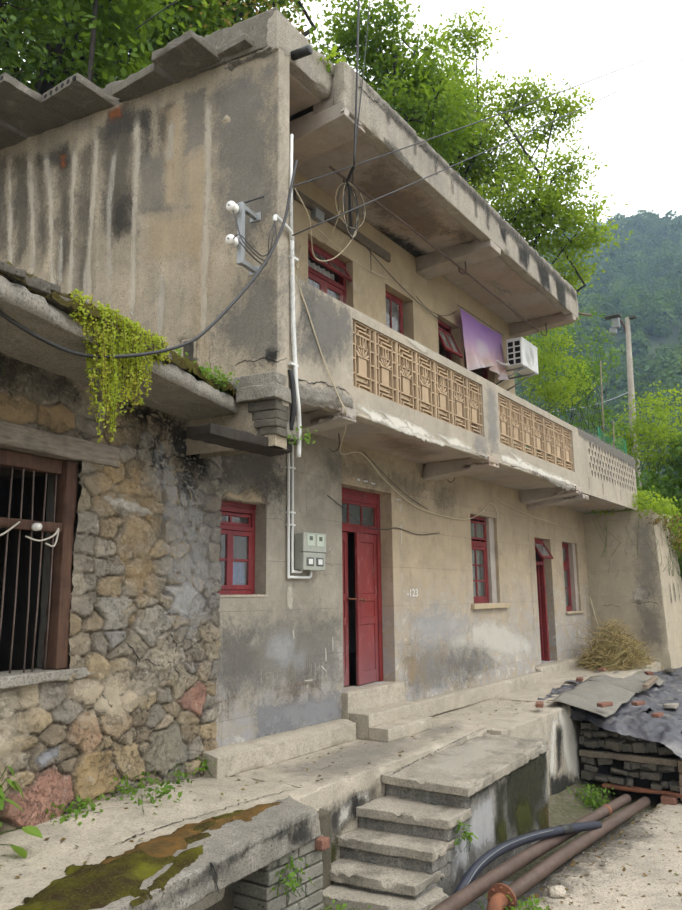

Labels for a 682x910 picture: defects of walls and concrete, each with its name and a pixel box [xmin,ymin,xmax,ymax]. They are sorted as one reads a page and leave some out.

leakage [42,144,78,294]
leakage [87,104,173,314]
leakage [201,63,279,330]
leakage [180,338,195,361]
leakage [219,278,288,362]
leakage [298,283,351,362]
crack [298,379,353,398]
spalling [104,495,153,517]
leakage [258,692,340,738]
leakage [179,819,312,893]